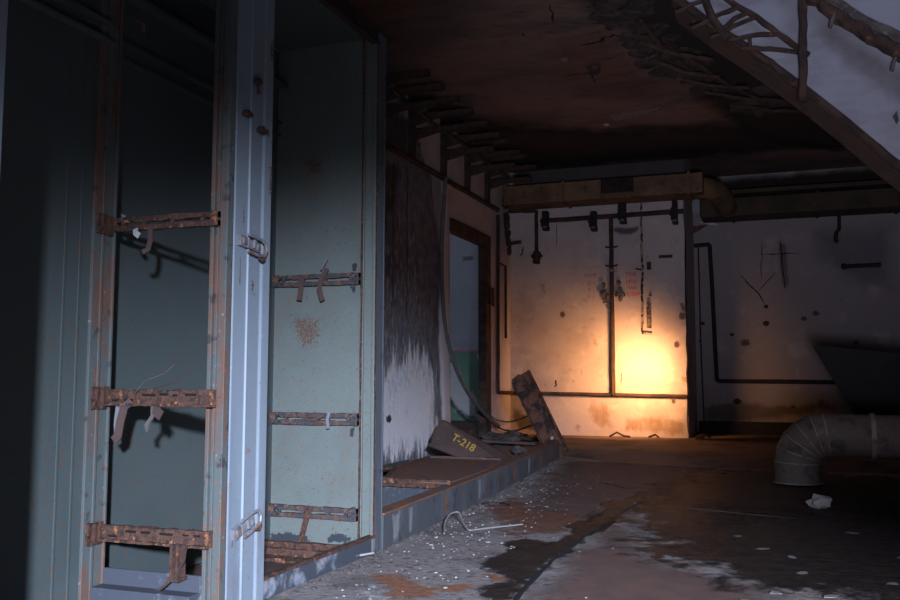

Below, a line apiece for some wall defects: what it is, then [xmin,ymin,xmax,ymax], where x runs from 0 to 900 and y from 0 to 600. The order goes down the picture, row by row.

spalling [672,0,810,83]
leakage [479,459,900,600]
corrosion [373,574,473,599]